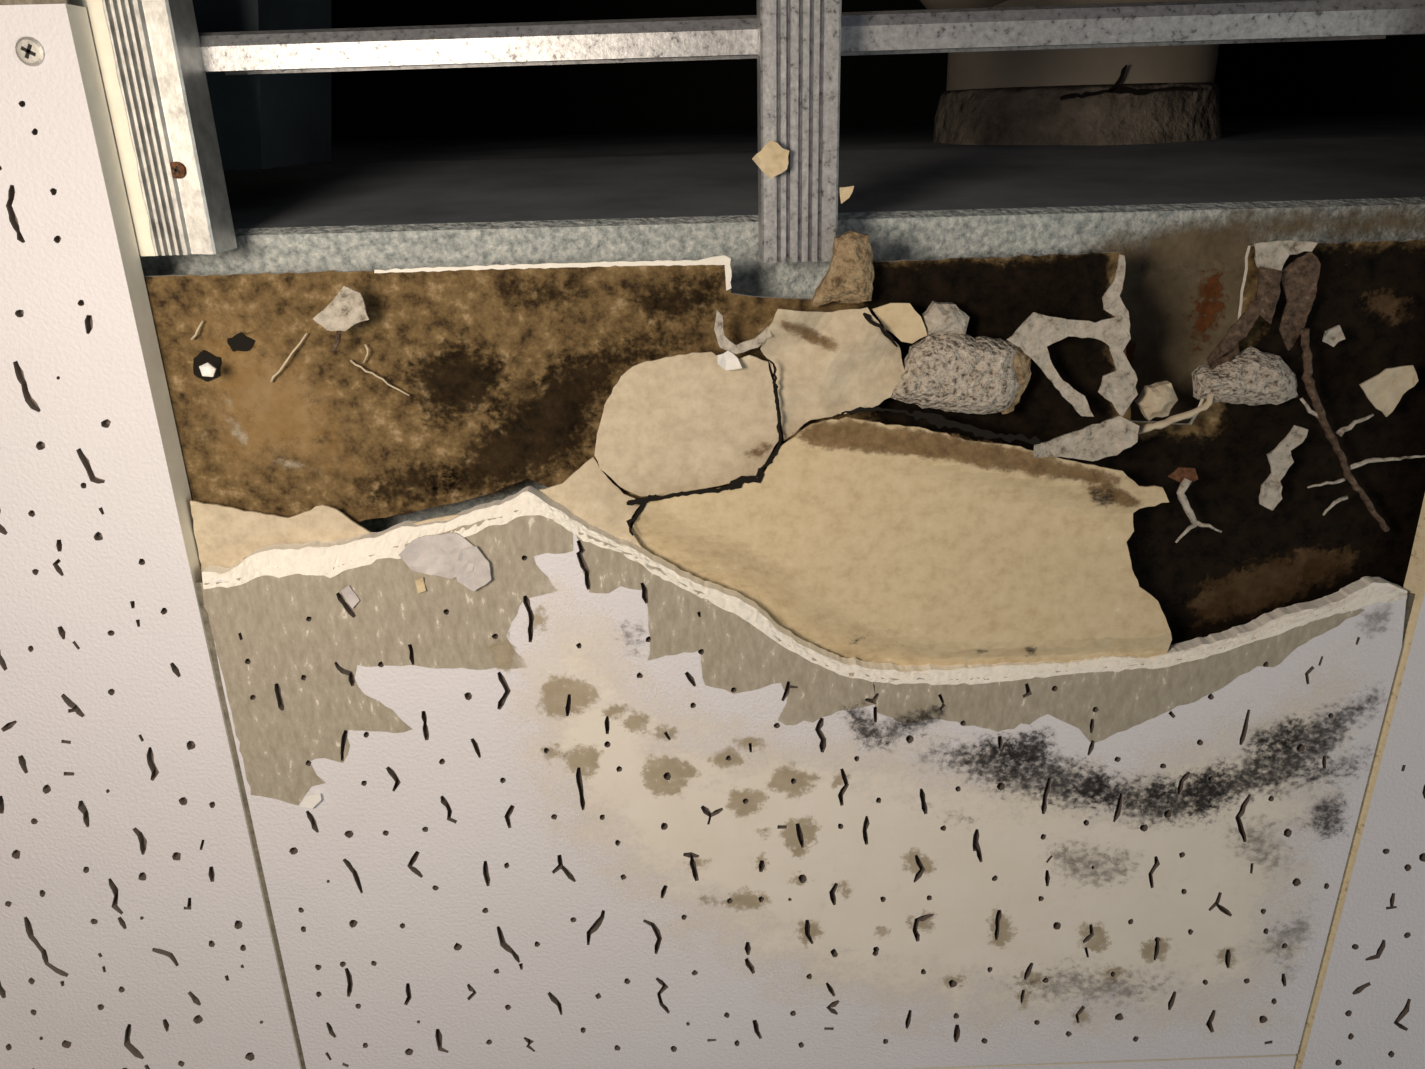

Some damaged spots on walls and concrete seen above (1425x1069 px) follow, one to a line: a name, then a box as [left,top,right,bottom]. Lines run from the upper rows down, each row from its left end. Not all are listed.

damp [184,322,336,467]
damp [367,273,726,510]
spalling [374,255,732,291]
crack [626,359,782,536]
damp [781,320,835,349]
crack [863,313,898,347]
damp [798,211,1425,645]
peeling [200,486,1407,809]
damp [489,606,1378,1032]